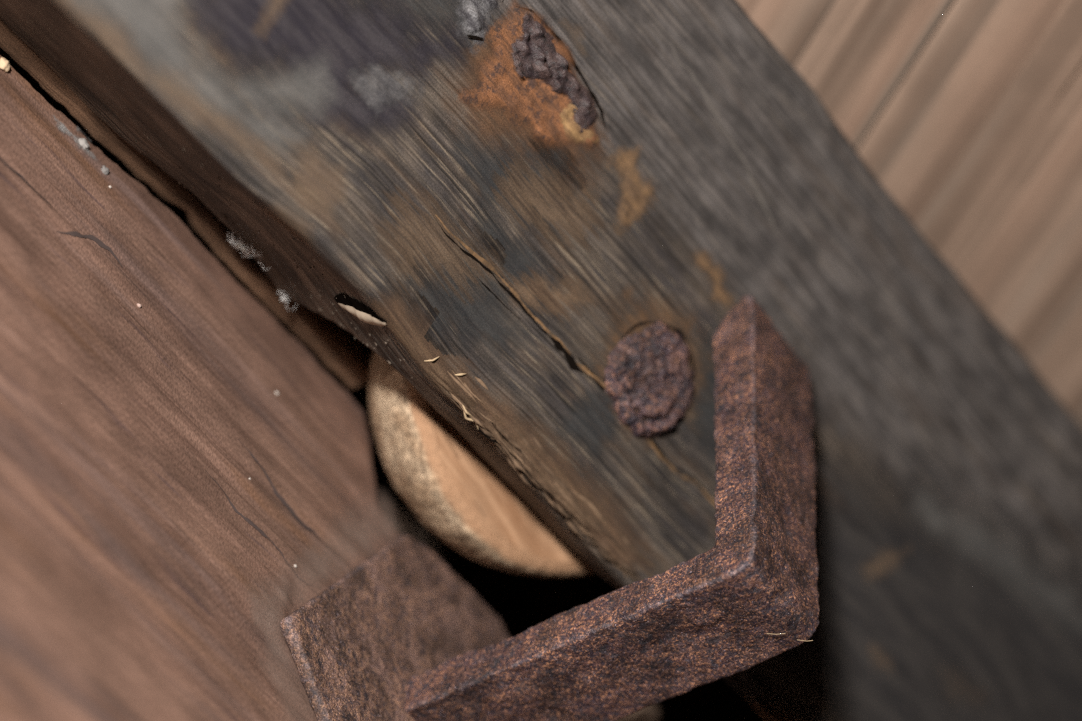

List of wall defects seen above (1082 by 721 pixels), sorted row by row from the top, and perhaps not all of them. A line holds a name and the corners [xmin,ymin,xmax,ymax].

rust [461,3,605,201]
crack [435,214,606,391]